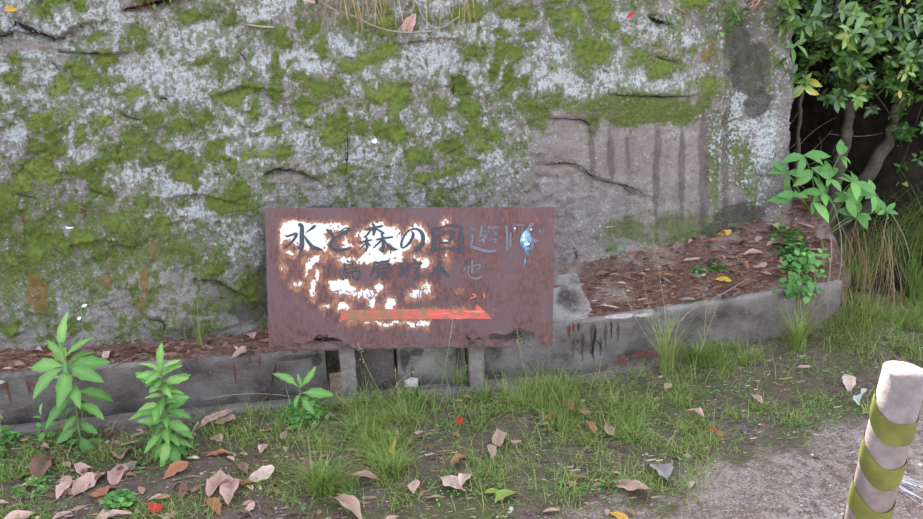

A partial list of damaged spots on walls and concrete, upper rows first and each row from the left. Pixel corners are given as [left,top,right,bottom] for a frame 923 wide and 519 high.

crack [0,19,109,70]
crack [539,163,649,199]